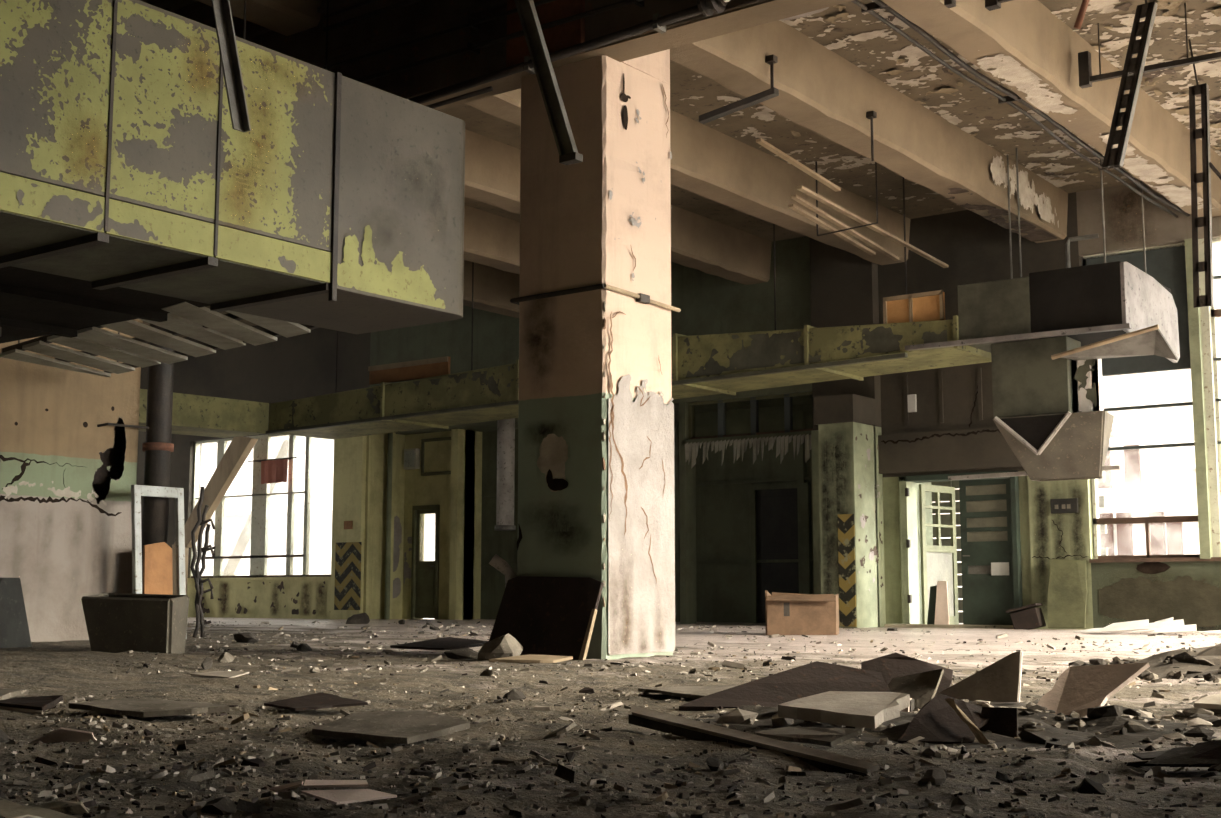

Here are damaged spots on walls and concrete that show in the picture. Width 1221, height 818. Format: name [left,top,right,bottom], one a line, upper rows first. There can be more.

peeling [680,94,883,186]
peeling [779,0,1221,242]
peeling [41,195,163,244]
peeling [268,256,298,273]
peeling [672,331,821,379]
peeling [837,325,903,355]
peeling [919,324,947,344]
crack [0,455,122,516]
spalling [3,406,127,506]
crack [608,311,665,584]